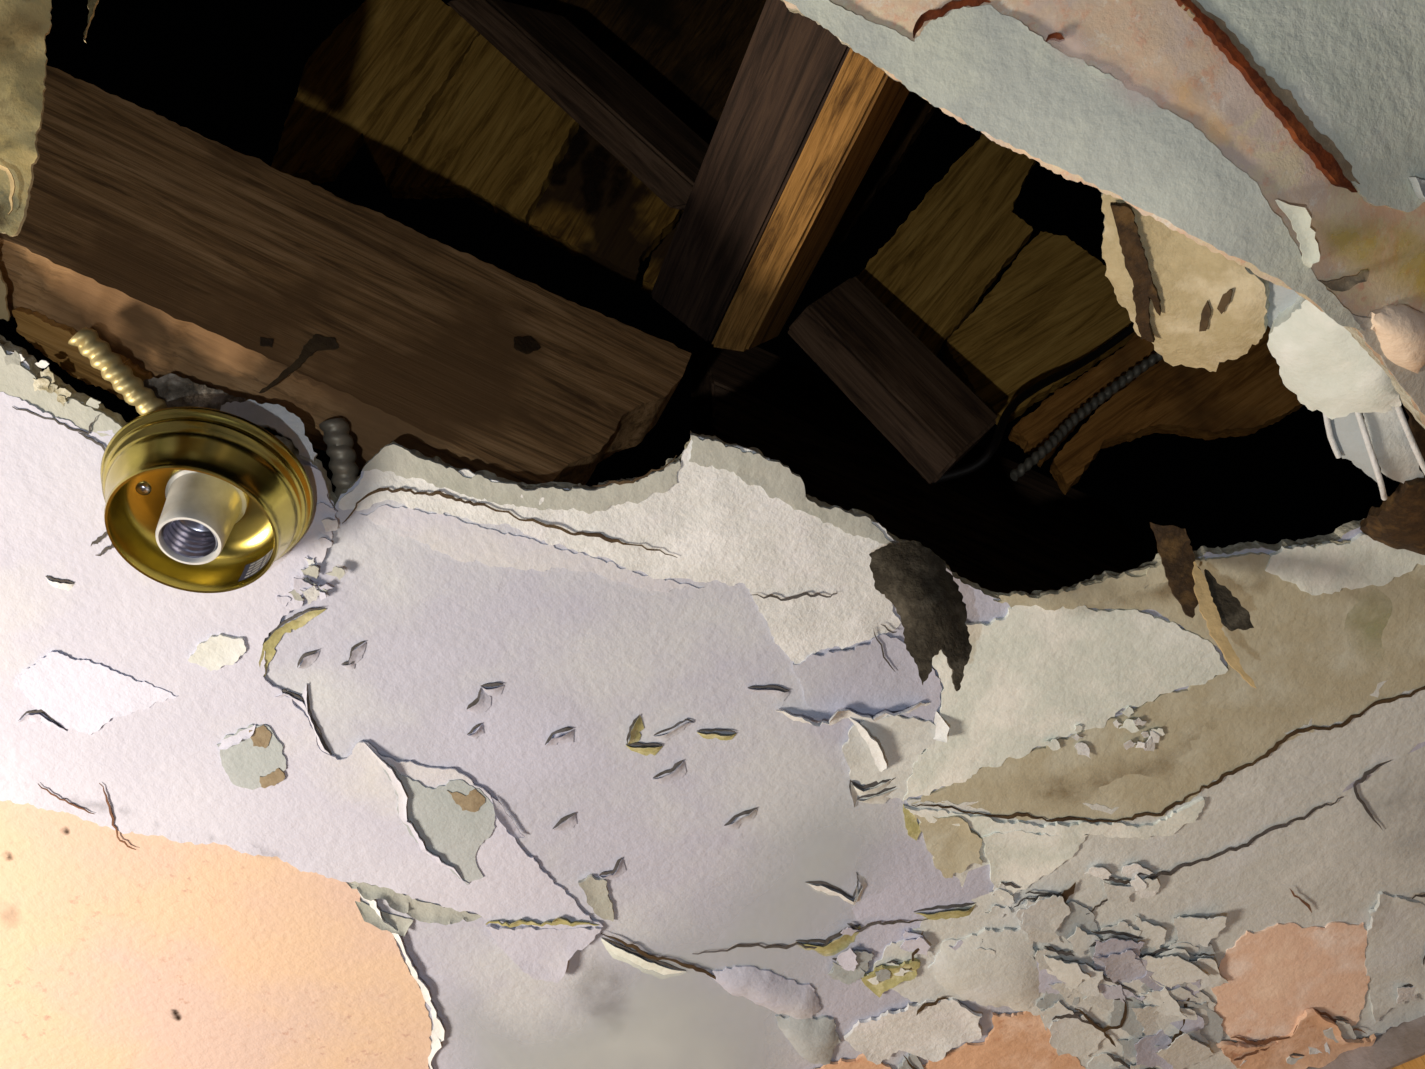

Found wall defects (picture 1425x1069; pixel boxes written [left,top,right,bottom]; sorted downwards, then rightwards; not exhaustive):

peeling [785,0,1425,416]
crack [342,488,678,558]
peeling [0,344,901,983]
crack [912,686,1425,823]
peeling [828,532,1425,1069]
crack [1150,760,1391,880]
crack [1061,882,1108,915]
crack [1290,889,1312,913]
crack [601,919,928,979]
crack [916,997,949,1016]
crack [1075,1000,1127,1047]
crack [1168,998,1190,1046]